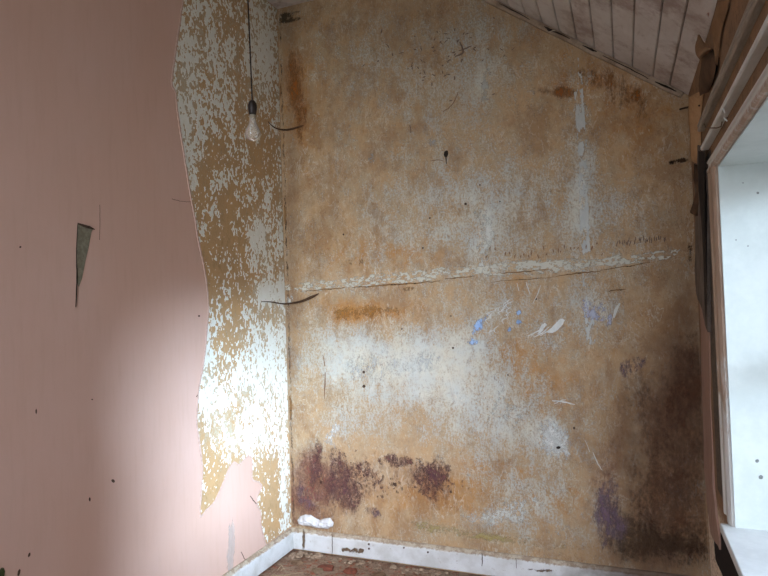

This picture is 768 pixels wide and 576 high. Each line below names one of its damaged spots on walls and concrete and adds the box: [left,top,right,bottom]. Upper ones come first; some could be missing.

peeling [171,0,337,546]
corrosion [335,305,389,320]
damp [594,358,705,558]